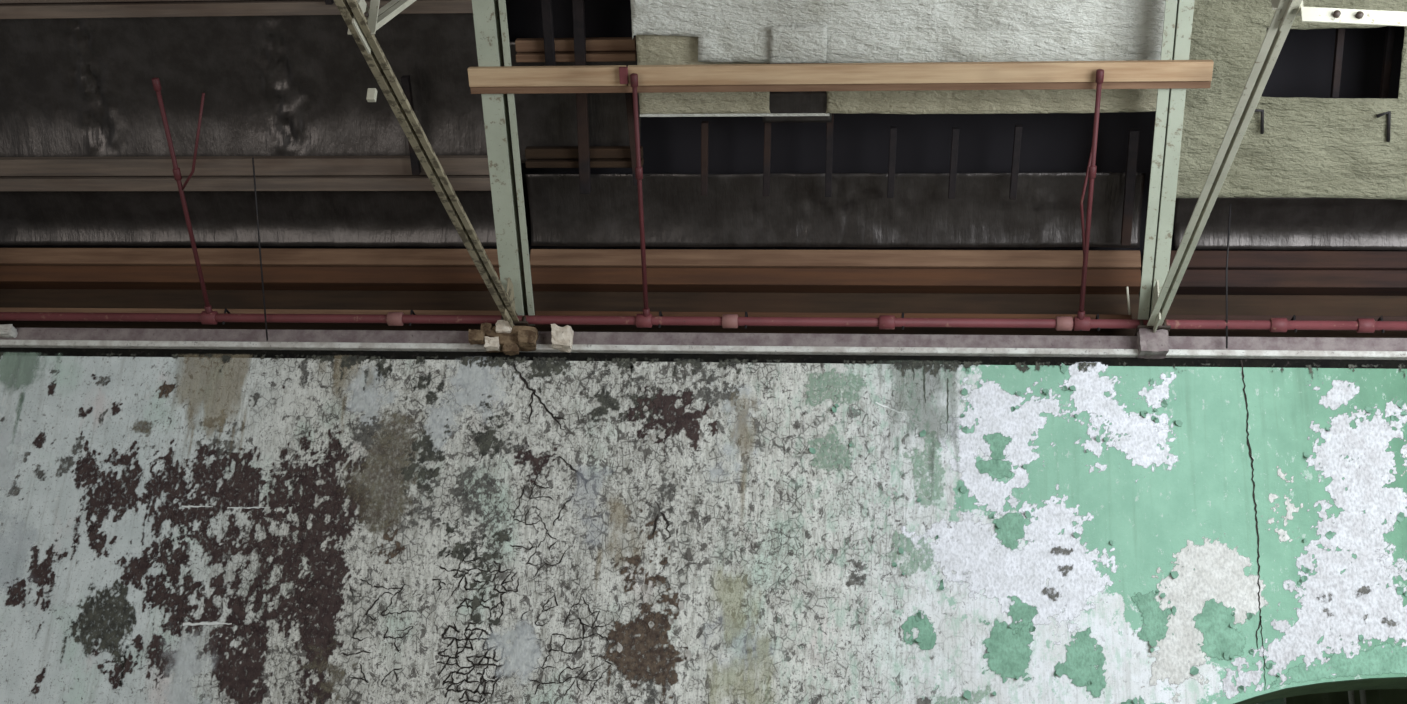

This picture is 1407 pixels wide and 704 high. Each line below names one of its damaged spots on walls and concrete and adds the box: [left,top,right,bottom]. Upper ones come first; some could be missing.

crack [343,364,612,704]
flaking render [602,554,692,704]
flaking render [626,386,718,462]
peeling [892,362,1183,644]
crack [1241,360,1266,685]
peeling [1121,380,1407,704]